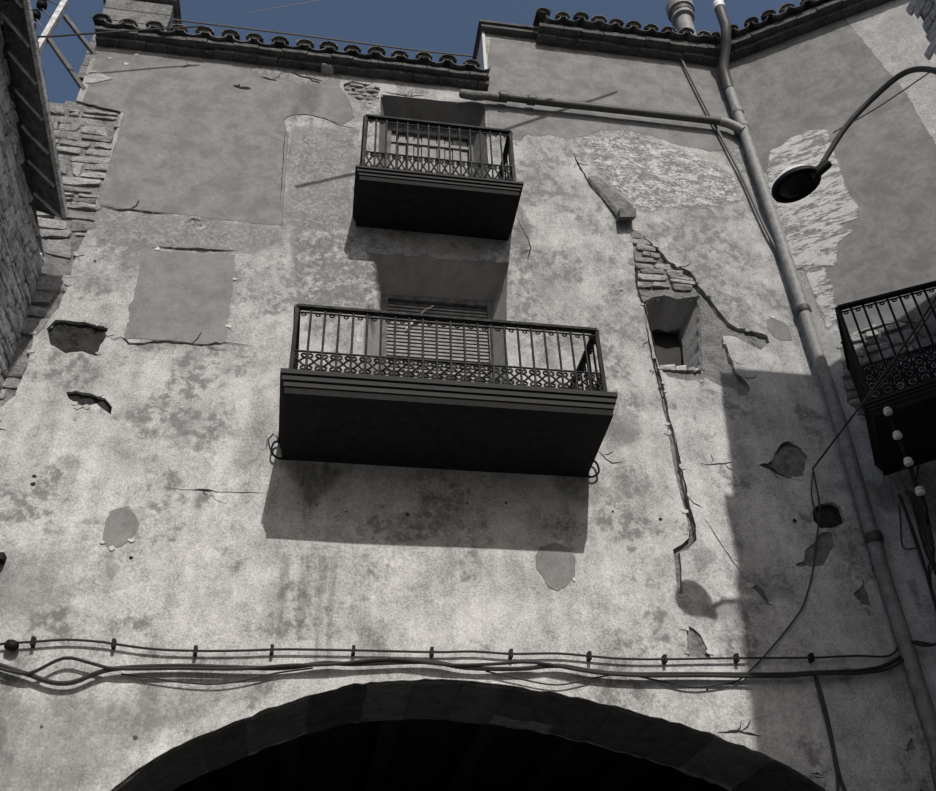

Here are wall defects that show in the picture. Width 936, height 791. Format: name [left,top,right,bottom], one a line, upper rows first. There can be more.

flaking render [0,100,281,408]
peeling [286,126,378,308]
spalling [628,228,768,396]
peeling [767,129,859,328]
spalling [67,391,112,415]
spalling [760,444,807,480]
spalling [785,499,850,570]